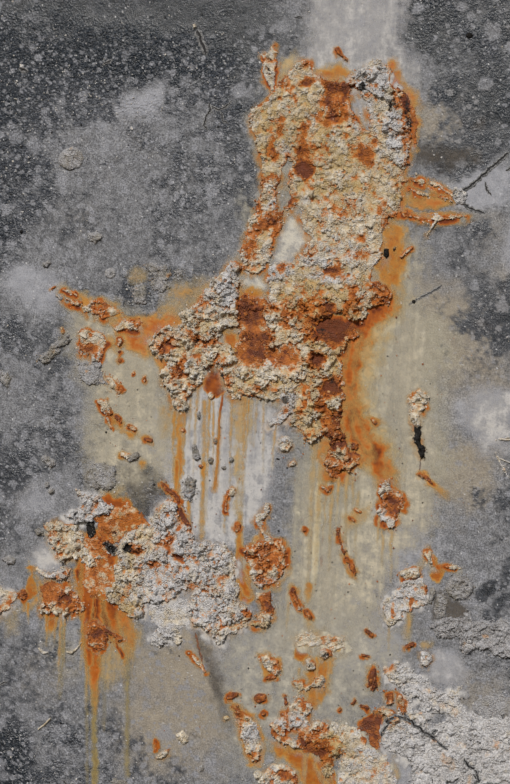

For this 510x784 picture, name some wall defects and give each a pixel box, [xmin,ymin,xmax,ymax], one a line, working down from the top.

corrosion [78,284,206,369]
corrosion [327,175,470,487]
damp [470,390,510,454]
corrosion [102,492,132,509]
damp [238,536,296,590]
corrosion [73,529,141,784]
damp [147,598,190,648]
damp [428,574,510,659]
damp [249,762,300,784]
corrosion [224,692,337,784]
crack [380,712,499,784]
damp [468,710,510,736]